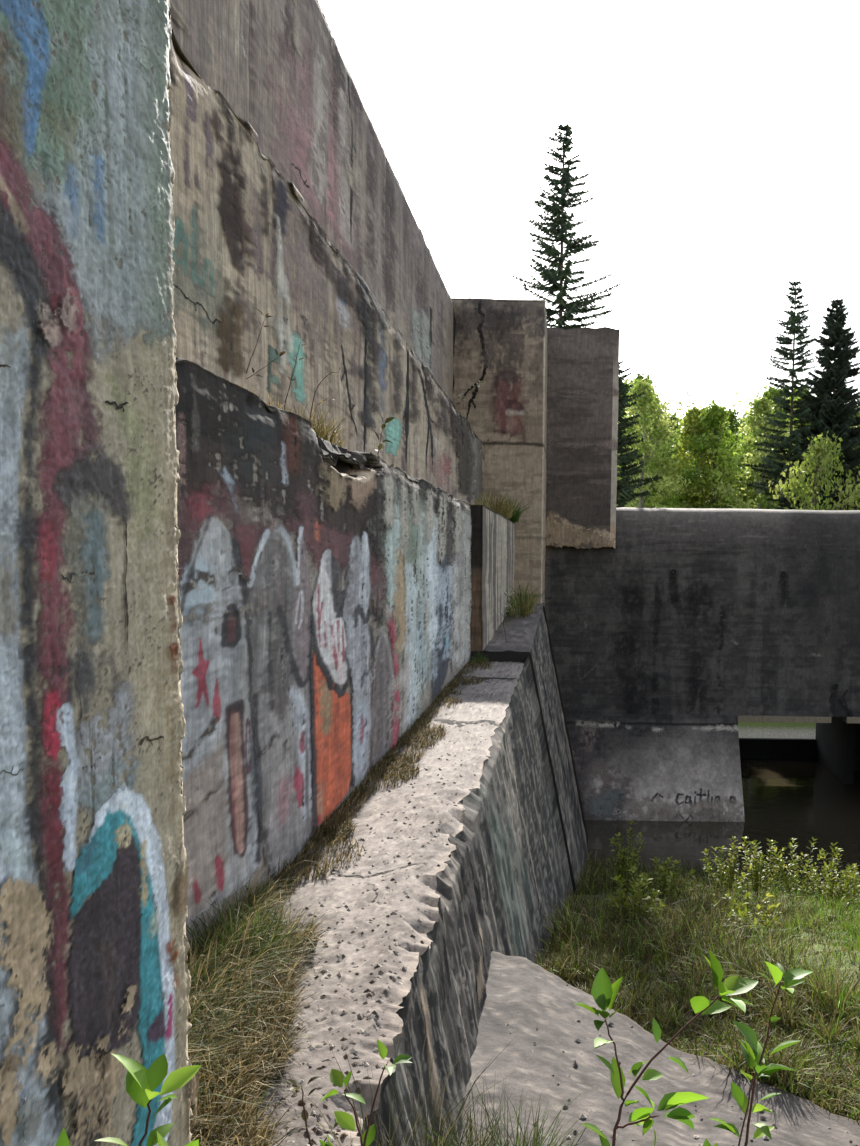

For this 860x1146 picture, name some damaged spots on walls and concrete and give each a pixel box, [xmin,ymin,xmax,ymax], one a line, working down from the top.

spalling [311,424,377,511]
crack [341,326,377,477]
crack [403,301,488,473]
spalling [545,511,616,549]
peeling [0,876,137,1146]